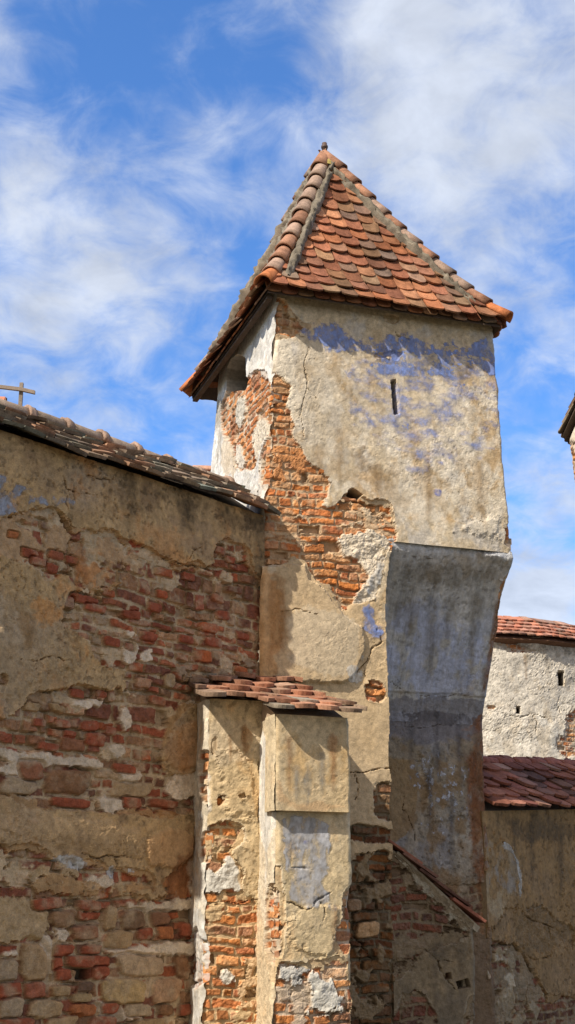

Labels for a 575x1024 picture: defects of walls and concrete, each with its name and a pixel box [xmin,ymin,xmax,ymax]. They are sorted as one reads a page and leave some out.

crack [300,347,318,437]
peeling [274,297,495,438]
crack [161,546,225,573]
spalling [0,368,398,819]
leakage [411,759,471,834]
spalling [0,780,473,1024]
spalling [487,938,575,1024]